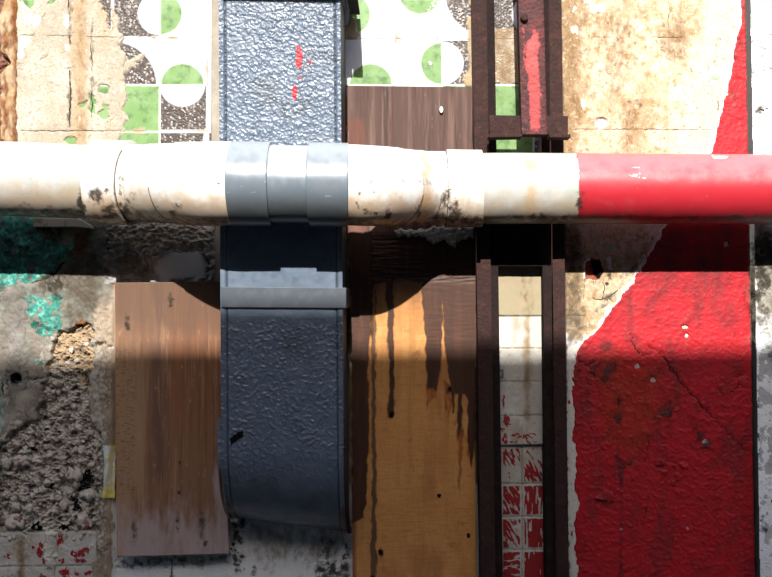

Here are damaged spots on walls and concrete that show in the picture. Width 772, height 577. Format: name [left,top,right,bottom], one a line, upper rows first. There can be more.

corrosion [3,0,18,142]
peeling [707,0,772,154]
water stain [749,232,772,336]
spalling [0,216,115,577]
water stain [348,231,477,576]
peeling [567,224,772,577]
crack [631,335,754,456]
water stain [117,517,245,572]
peeling [501,395,544,577]